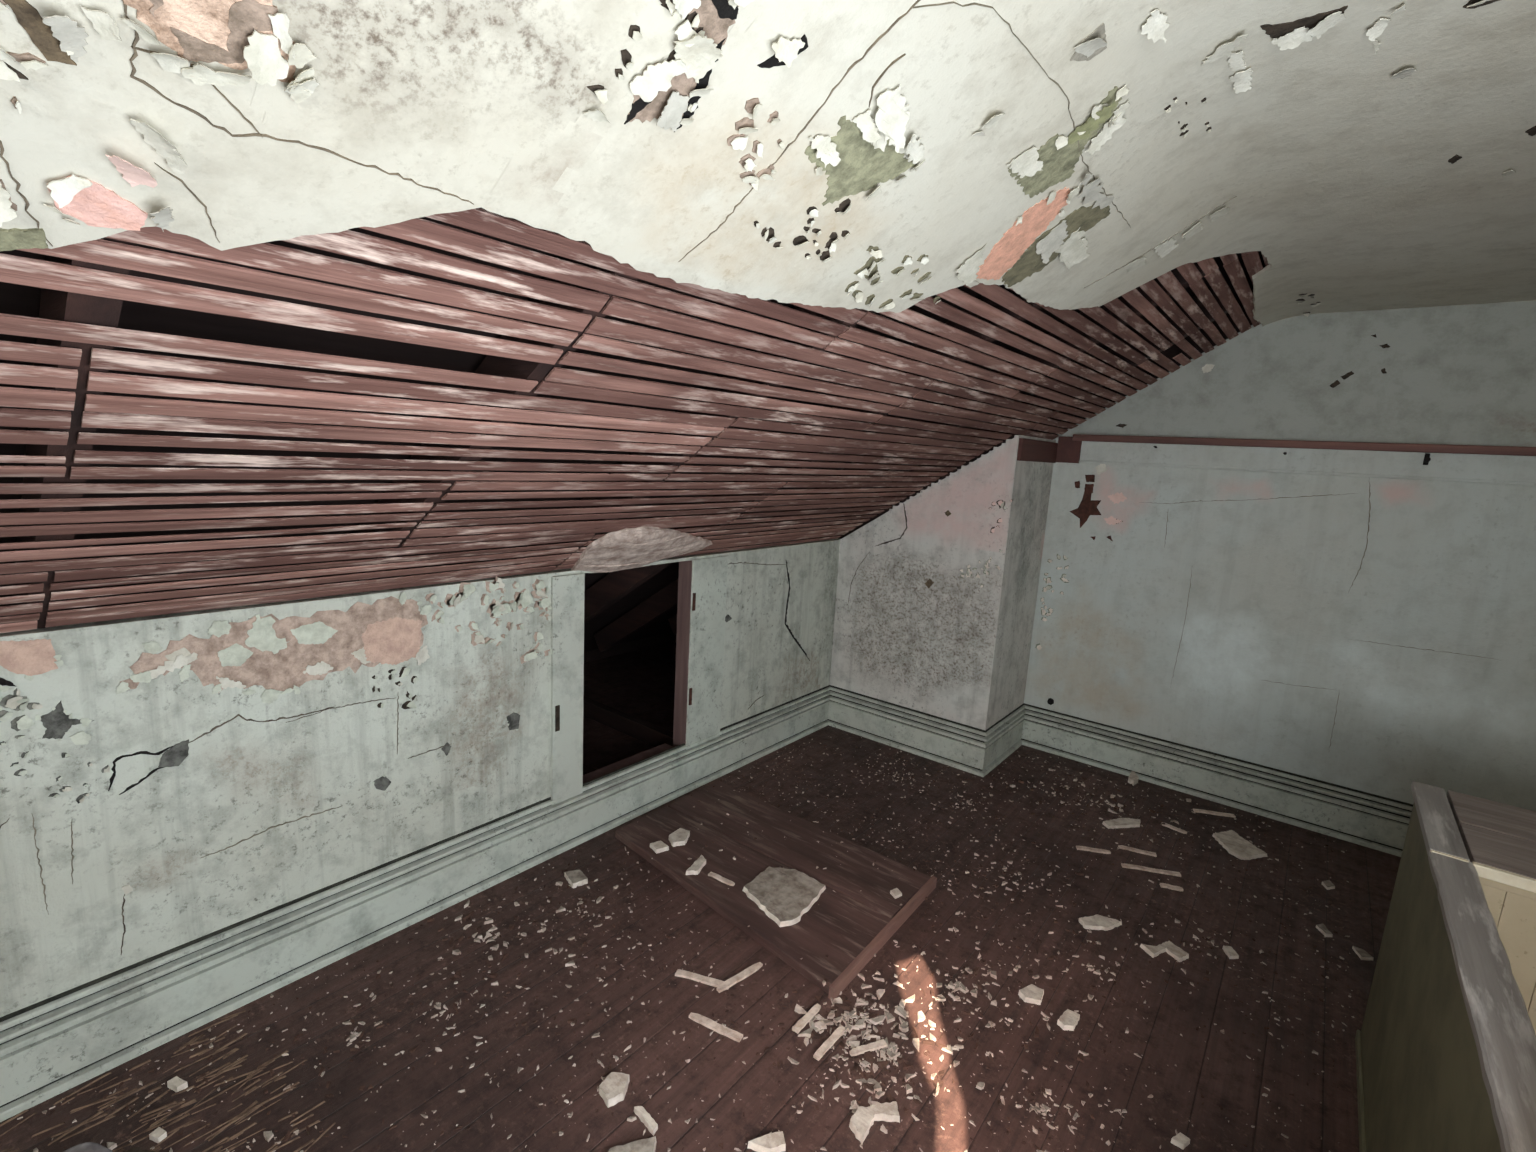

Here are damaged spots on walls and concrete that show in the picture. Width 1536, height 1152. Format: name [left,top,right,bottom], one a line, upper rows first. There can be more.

crack [0,140,53,247]
flaking render [0,0,320,114]
crack [154,162,220,243]
crack [122,0,474,205]
peeling [583,0,755,132]
peeling [754,53,925,263]
crack [678,0,1131,262]
flaking render [956,85,1130,288]
peeling [1201,6,1348,94]
damp [771,435,1019,709]
flaking render [116,576,552,709]
crack [0,814,74,915]